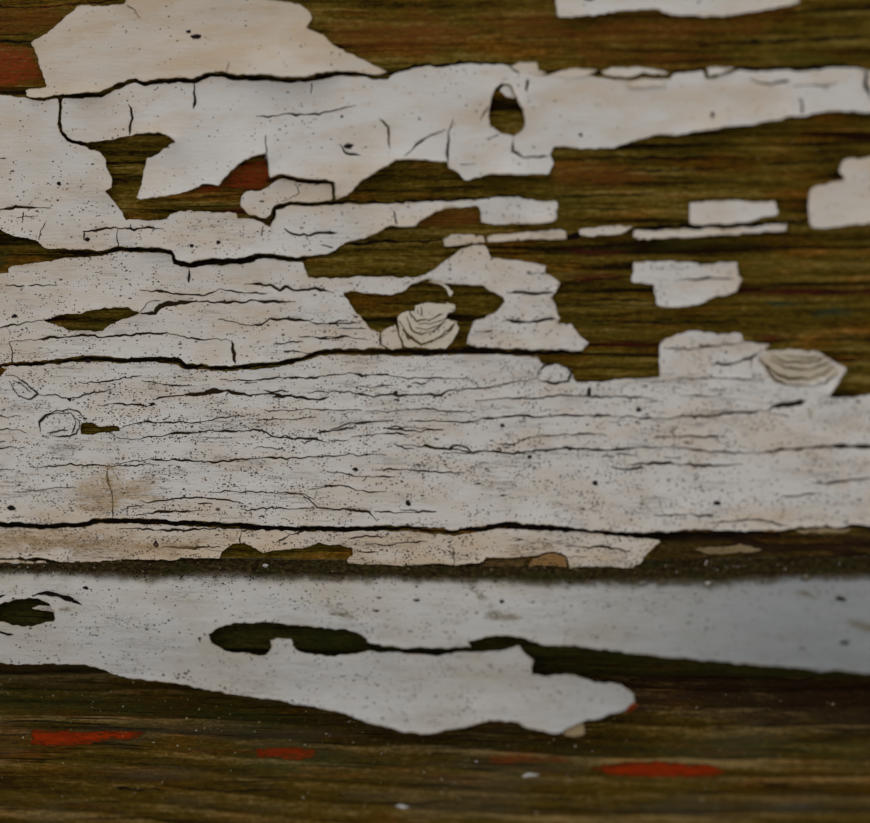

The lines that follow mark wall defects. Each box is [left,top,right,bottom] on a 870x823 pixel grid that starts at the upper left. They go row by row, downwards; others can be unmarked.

crack [0,0,139,17]
crack [672,35,870,114]
peeling [0,0,870,568]
crack [0,60,870,564]
peeling [0,569,870,737]